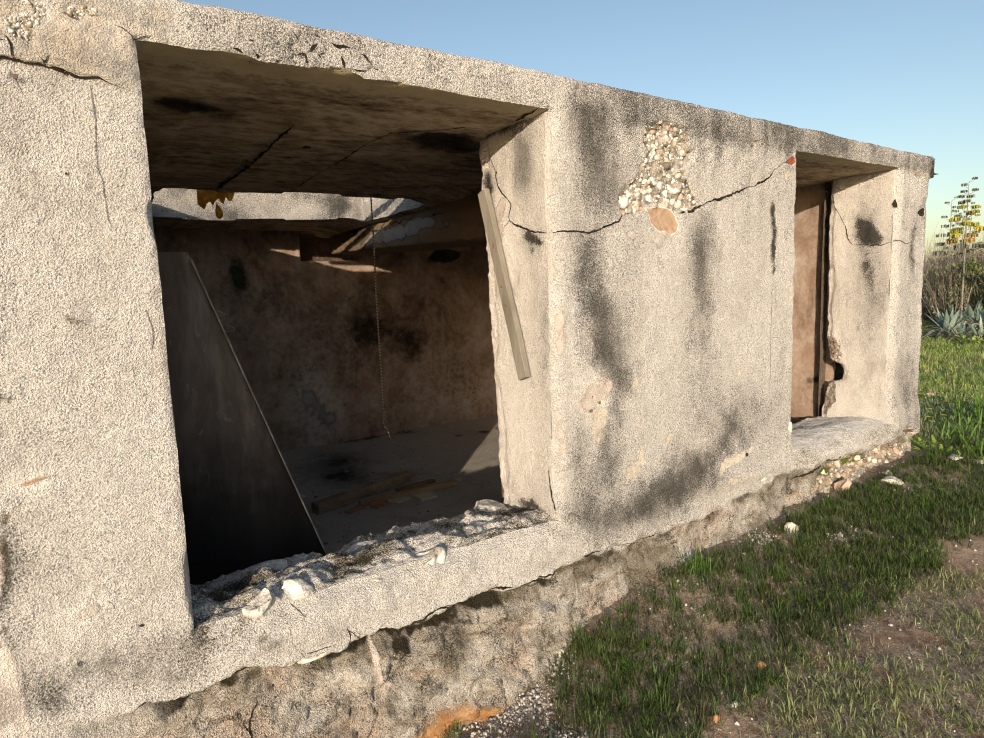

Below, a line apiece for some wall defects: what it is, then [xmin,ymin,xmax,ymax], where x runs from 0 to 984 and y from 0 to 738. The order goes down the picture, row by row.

spalling [2,0,46,41]
spalling [62,5,98,20]
crack [0,34,137,227]
crack [217,124,295,189]
water stain [406,132,478,155]
crack [489,154,629,234]
spalling [618,119,697,236]
crack [832,194,912,246]
water stain [853,216,884,287]
spalling [828,335,842,364]
flaking render [589,396,608,444]
spalling [823,380,836,414]